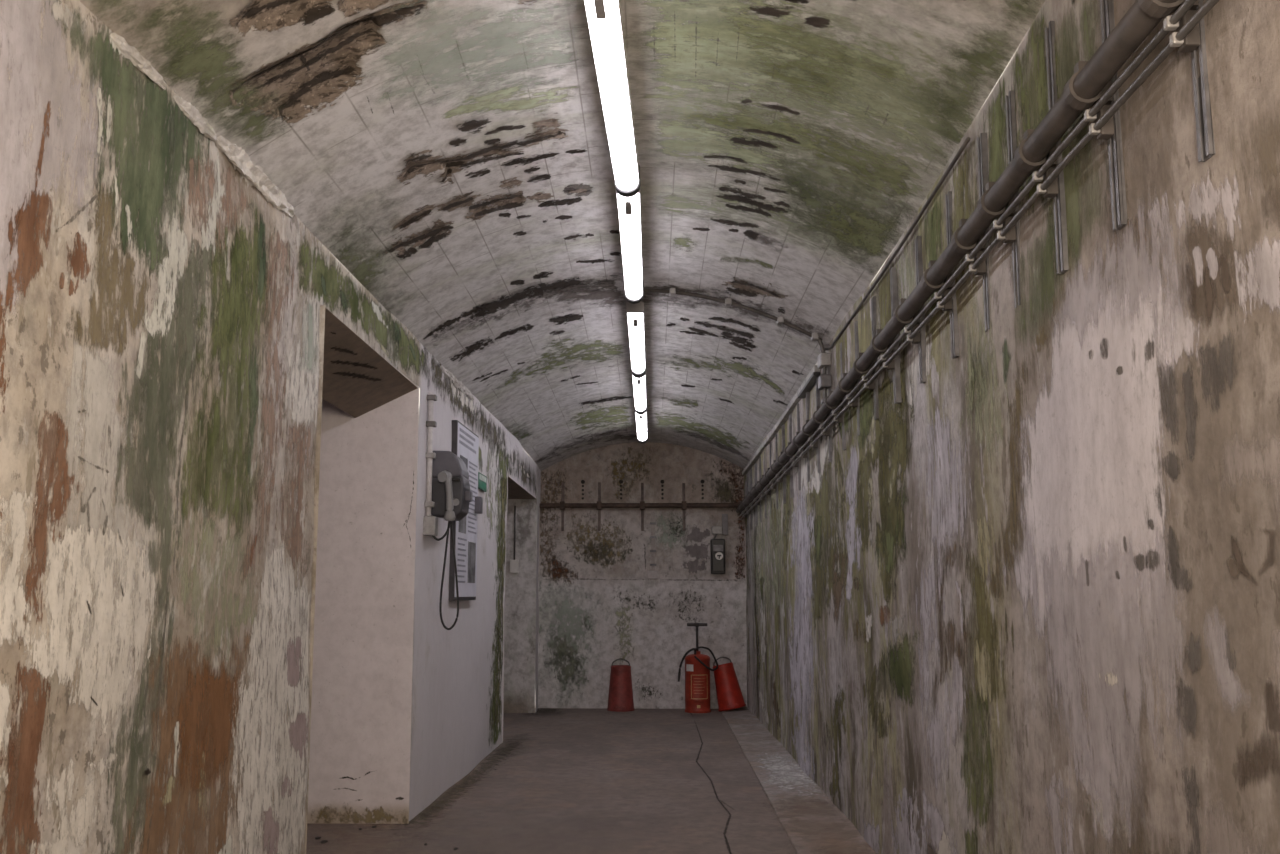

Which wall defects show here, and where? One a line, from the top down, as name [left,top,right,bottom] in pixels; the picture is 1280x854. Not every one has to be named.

spalling [229,0,428,124]
rust [0,101,53,413]
rust [23,411,79,623]
rust [60,231,91,296]
crack [56,189,104,232]
leakage [71,153,249,379]
leakage [859,336,974,854]
leakage [988,273,1071,597]
leakage [1111,122,1280,592]
rust [0,635,58,854]
crack [690,713,734,854]
leakage [1045,711,1200,854]